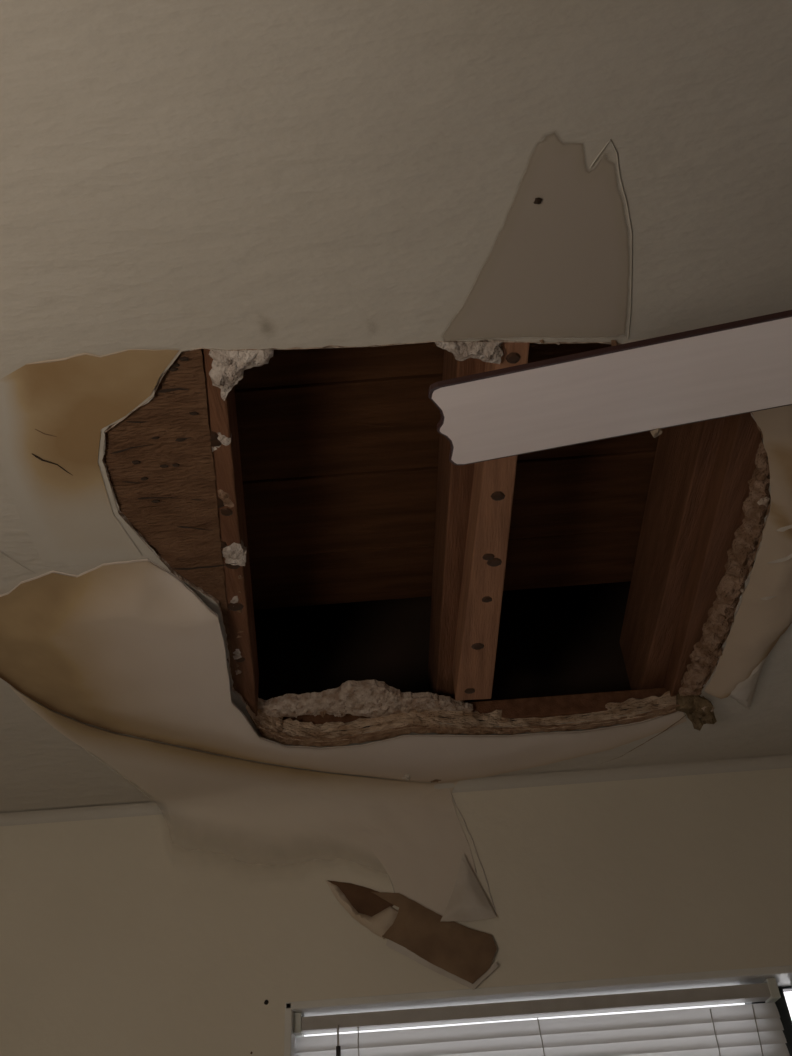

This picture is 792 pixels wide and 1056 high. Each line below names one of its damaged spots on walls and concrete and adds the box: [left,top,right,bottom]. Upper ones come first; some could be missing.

water stain [0,348,179,565]
spalling [102,349,237,691]
peeling [678,405,792,710]